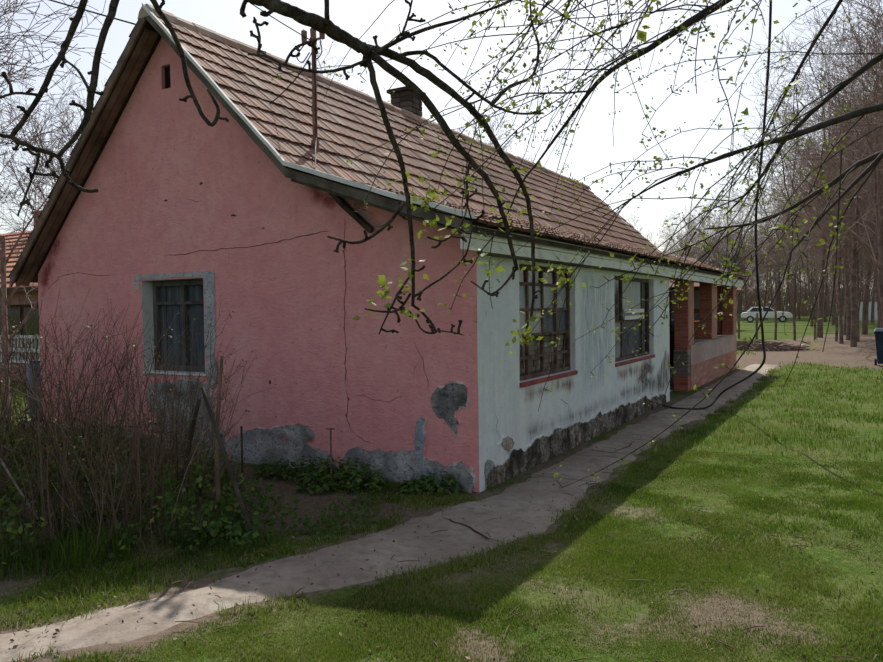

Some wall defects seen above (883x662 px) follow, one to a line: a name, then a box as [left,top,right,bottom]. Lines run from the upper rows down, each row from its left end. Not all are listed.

crack [165,218,377,446]
spalling [144,355,469,488]